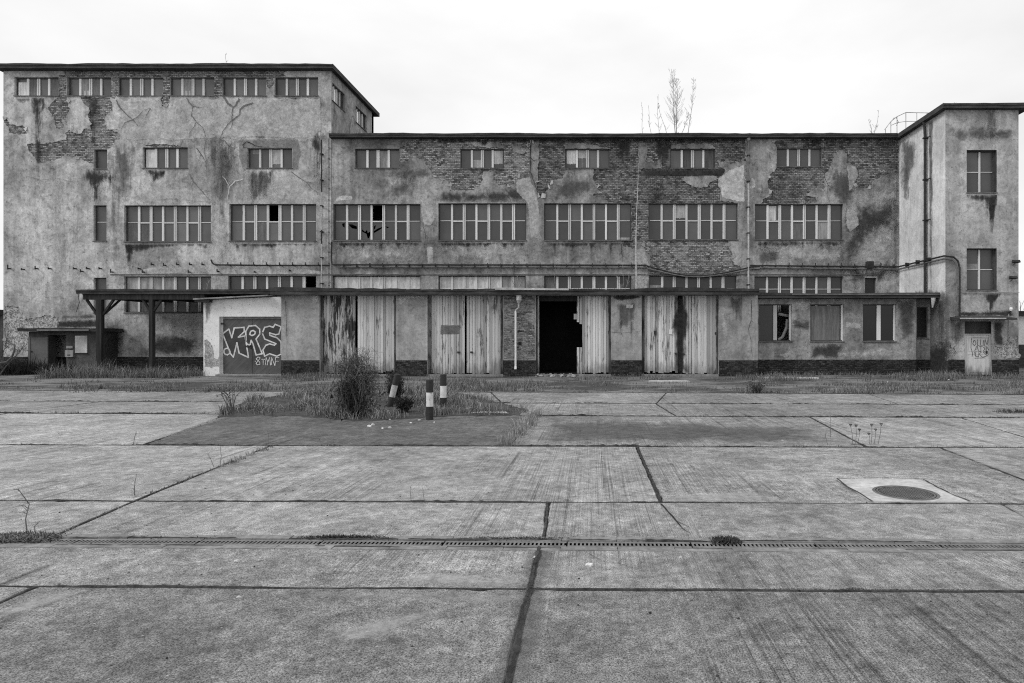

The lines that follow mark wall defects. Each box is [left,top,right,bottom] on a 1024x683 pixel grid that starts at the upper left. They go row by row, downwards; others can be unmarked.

water stain [86,148,134,207]
flaking render [3,71,321,164]
crack [186,97,261,199]
water stain [251,171,309,199]
flaking render [399,139,899,276]
water stain [759,143,914,262]
water stain [971,195,997,222]
water stain [673,296,688,371]